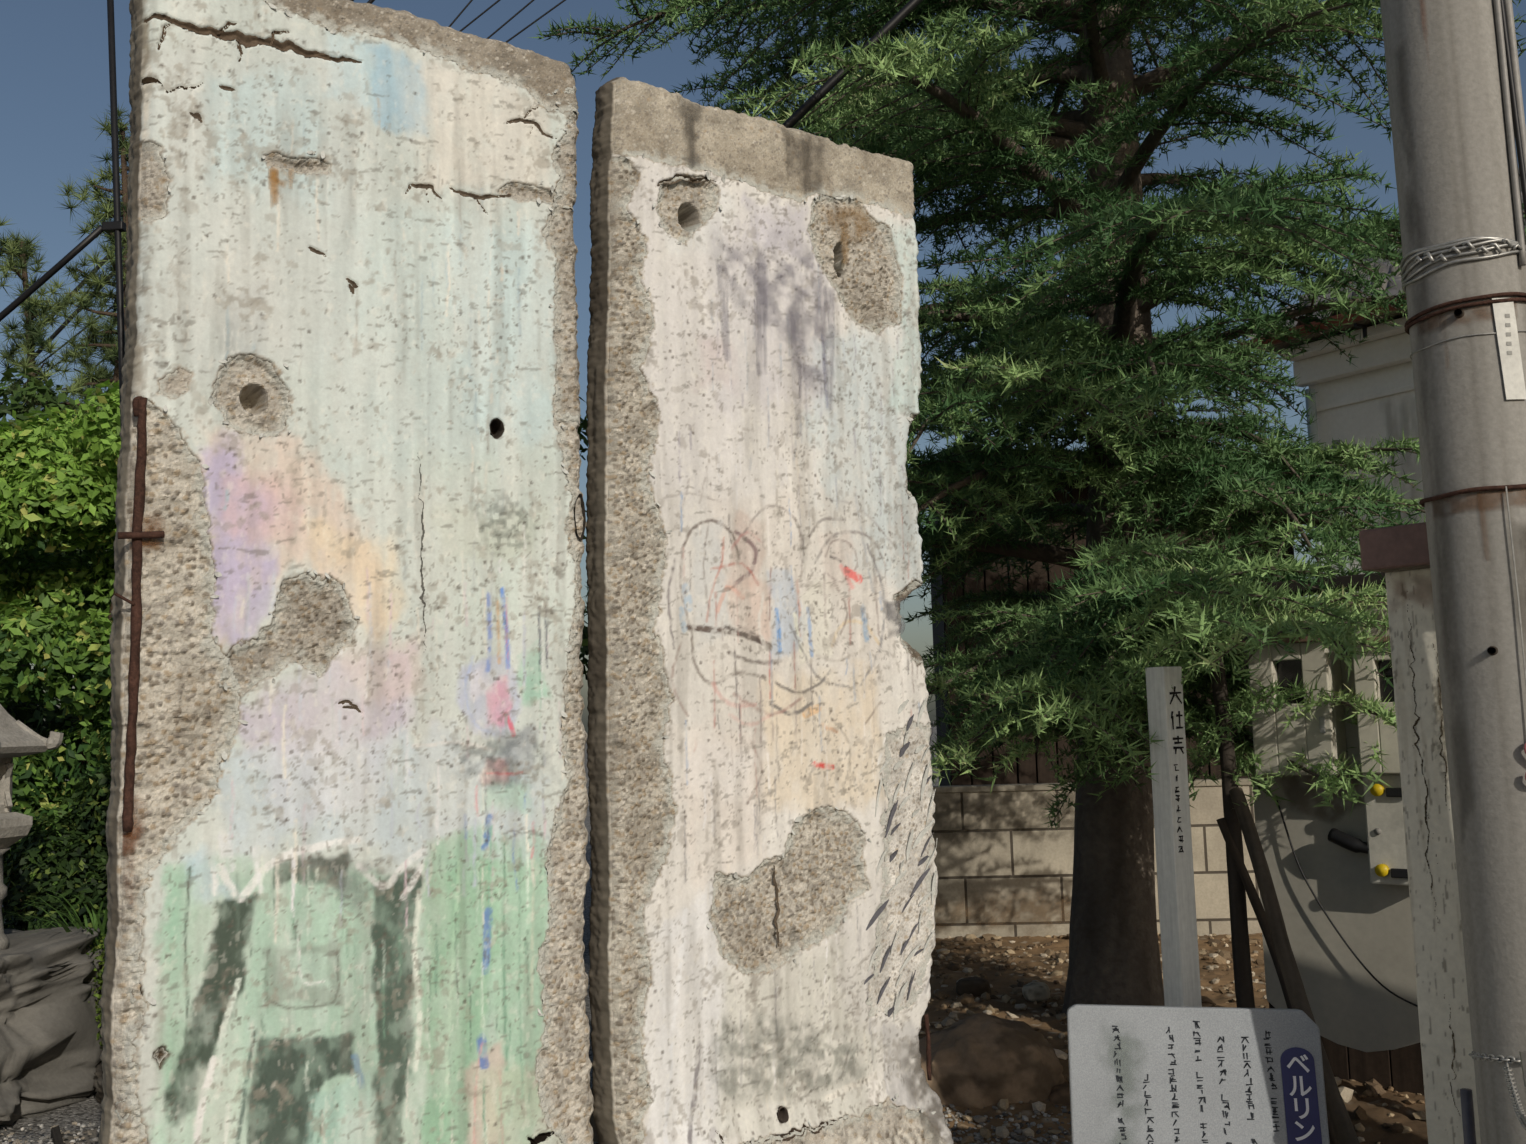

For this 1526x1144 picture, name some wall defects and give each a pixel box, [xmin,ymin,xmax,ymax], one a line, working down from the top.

crack [142,13,362,93]
crack [506,107,557,139]
crack [405,183,511,213]
spalling [208,354,292,437]
spalling [261,0,593,1144]
spalling [606,78,944,1144]
spalling [111,368,361,1144]
crack [1407,591,1450,919]
crack [527,1131,554,1144]